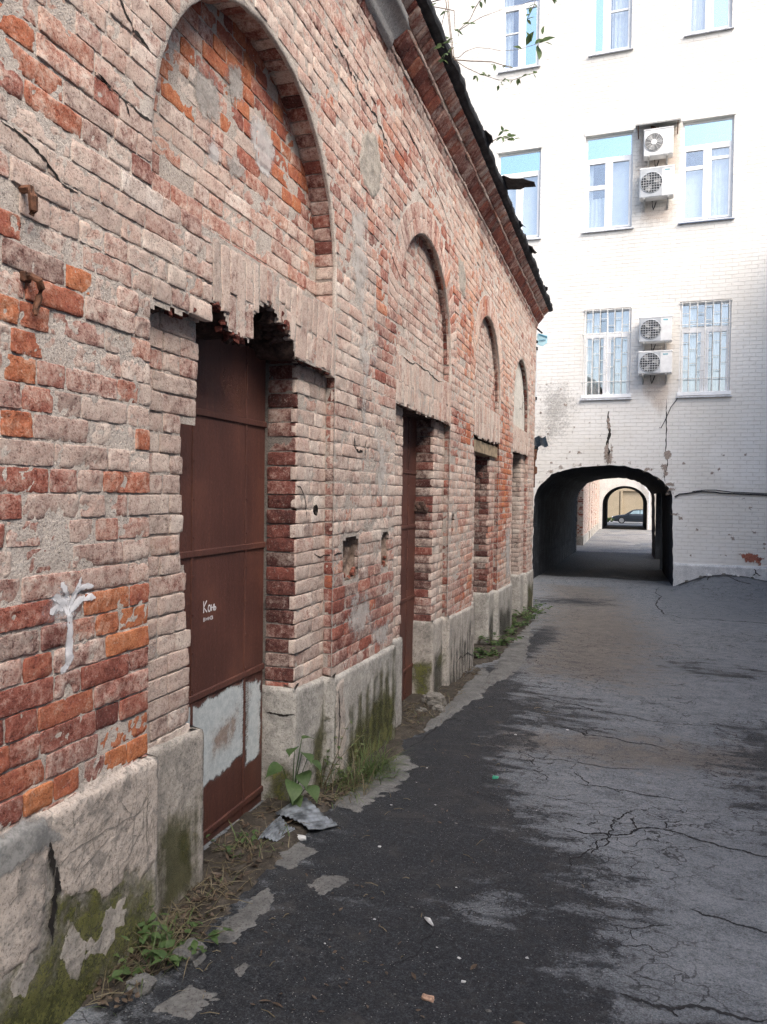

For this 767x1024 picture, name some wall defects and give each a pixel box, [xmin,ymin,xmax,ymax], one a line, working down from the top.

peeling [150,305,197,320]
peeling [210,297,290,345]
crack [604,411,613,463]
crack [660,400,671,480]
peeling [720,543,766,566]
peeling [186,681,261,787]
crack [519,695,767,869]
peeling [0,756,158,1011]
crack [48,779,149,945]
crack [608,897,670,954]
crack [692,909,767,933]
crack [621,993,767,1022]